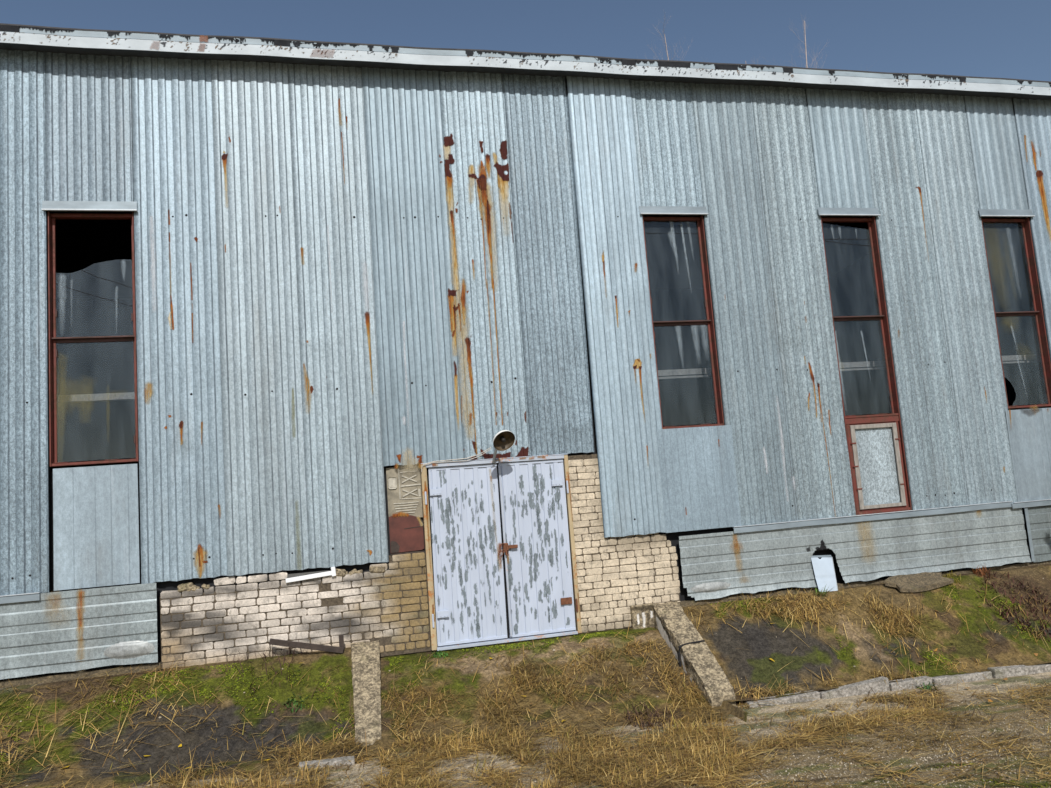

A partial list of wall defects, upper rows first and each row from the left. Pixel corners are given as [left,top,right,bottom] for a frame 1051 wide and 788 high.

peeling [0,25,74,45]
peeling [206,37,399,58]
peeling [466,50,580,68]
peeling [594,57,794,80]
peeling [922,75,966,89]
corrosion [222,137,231,195]
corrosion [1024,135,1051,239]
corrosion [439,134,514,454]
corrosion [365,312,373,390]
corrosion [633,354,651,416]
corrosion [195,545,208,577]
peeling [431,440,570,638]